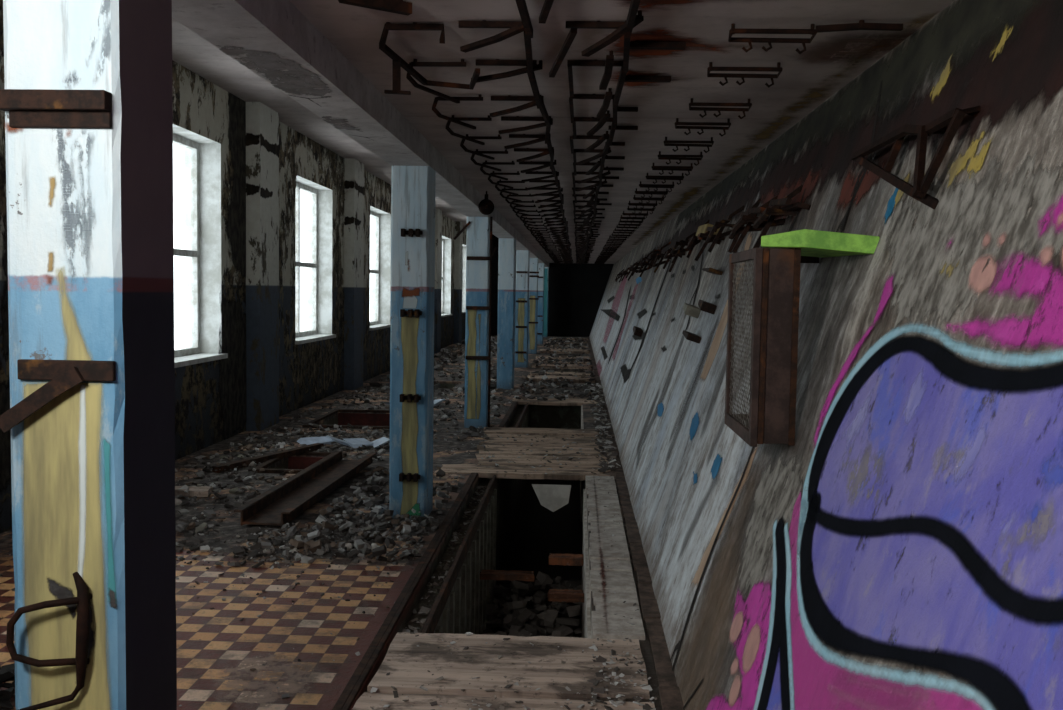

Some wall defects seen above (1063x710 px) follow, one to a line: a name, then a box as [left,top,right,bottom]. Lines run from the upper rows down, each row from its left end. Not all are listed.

peeling [92,0,111,63]
peeling [217,45,332,98]
rust [618,0,697,12]
rust [612,29,721,87]
peeling [322,116,360,131]
rust [639,0,1063,262]
peeling [56,129,92,277]
peeling [226,92,246,281]
peeling [285,130,345,353]